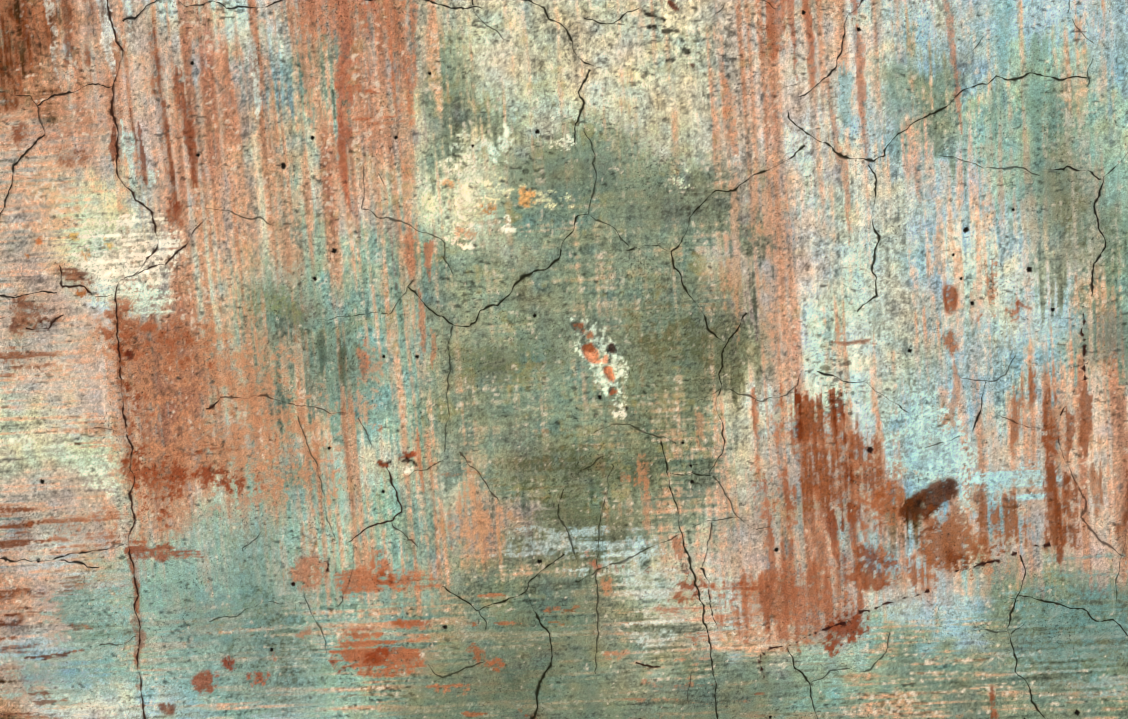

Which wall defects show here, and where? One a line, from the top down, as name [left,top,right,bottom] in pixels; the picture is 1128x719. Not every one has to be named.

crack [0,0,283,719]
crack [206,0,1094,719]
crack [925,154,1128,718]